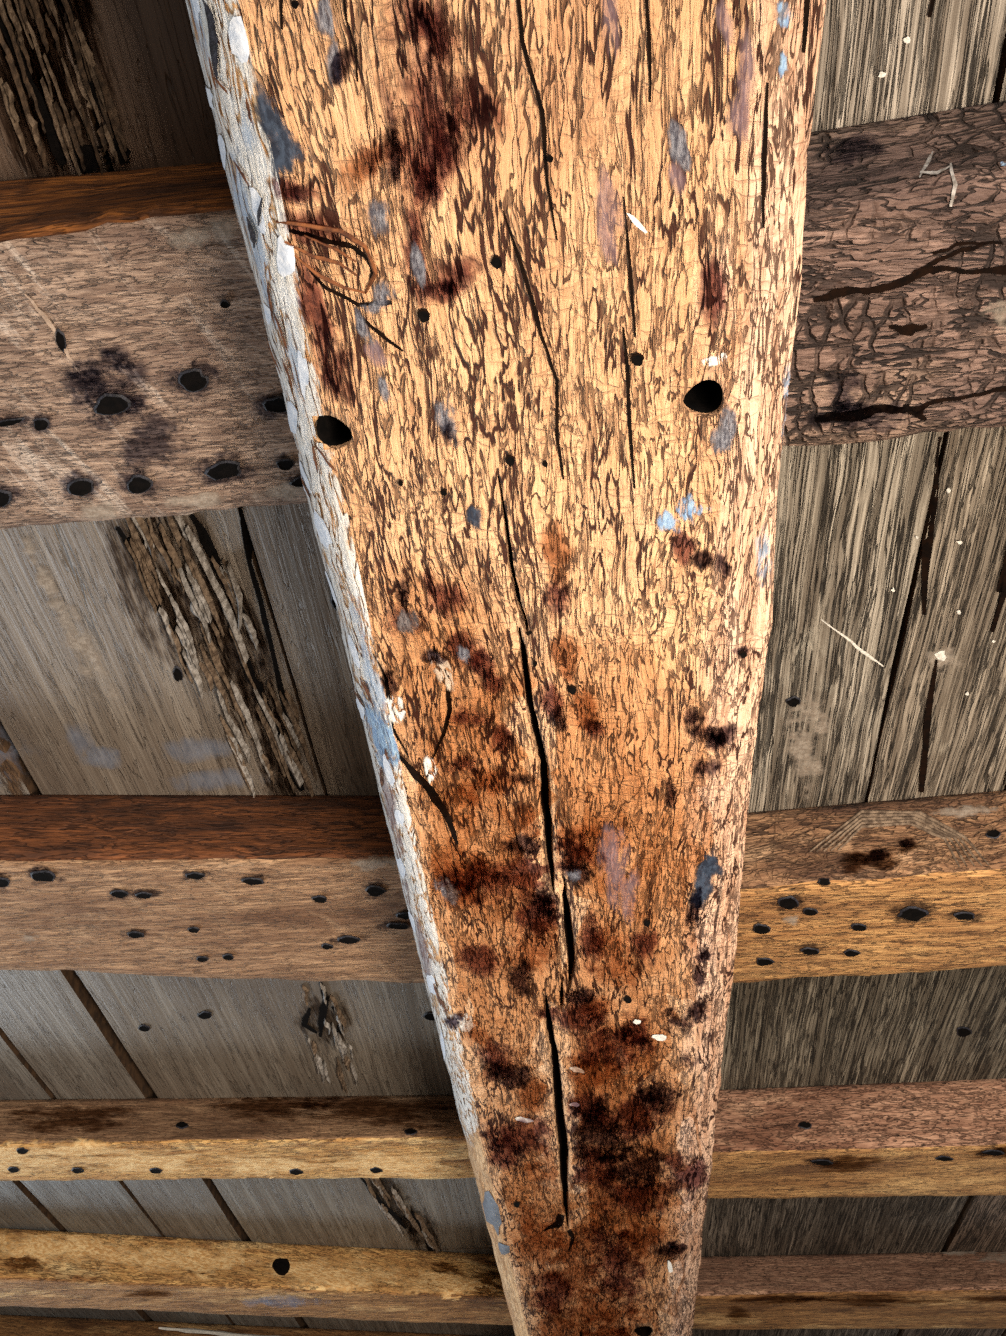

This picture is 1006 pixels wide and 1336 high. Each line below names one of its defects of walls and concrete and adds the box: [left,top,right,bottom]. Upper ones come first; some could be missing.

water stain [369,3,500,305]
water stain [447,634,503,693]
water stain [541,685,567,732]
water stain [665,782,677,808]
water stain [434,834,603,936]
crack [498,476,575,1251]
water stain [686,855,723,929]
water stain [458,946,534,998]
water stain [693,950,714,986]
water stain [537,987,708,1069]
water stain [476,1042,532,1090]
water stain [567,1081,708,1308]